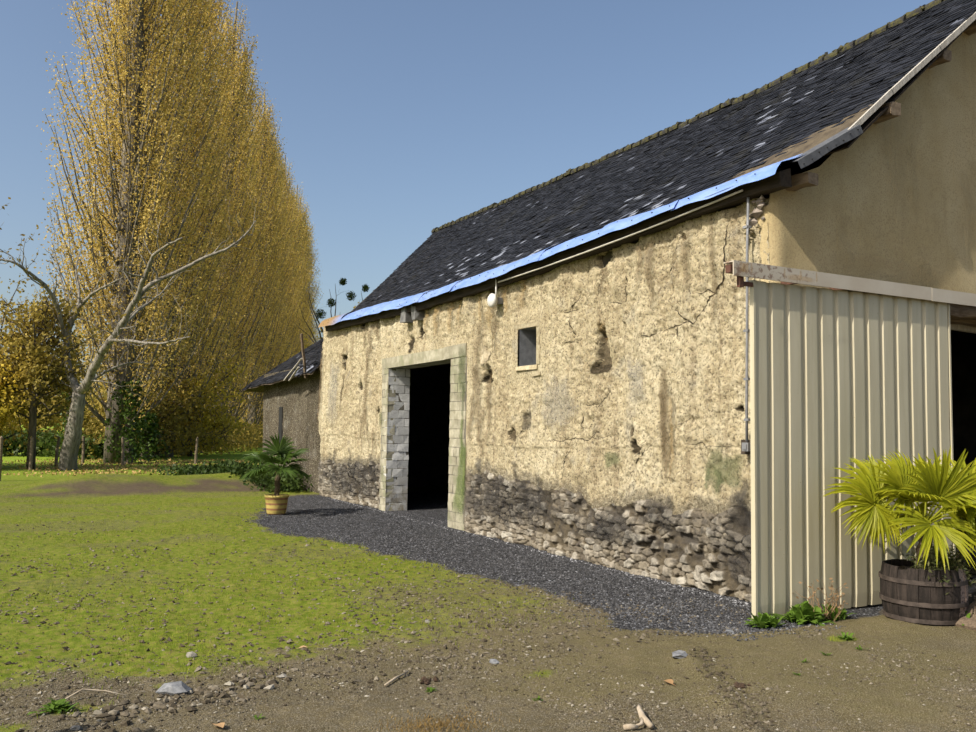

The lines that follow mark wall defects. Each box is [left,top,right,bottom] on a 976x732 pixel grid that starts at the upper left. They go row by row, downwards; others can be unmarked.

crack [642,225,730,339]
peeling [478,345,494,385]
spalling [590,326,612,375]
spalling [630,427,642,459]